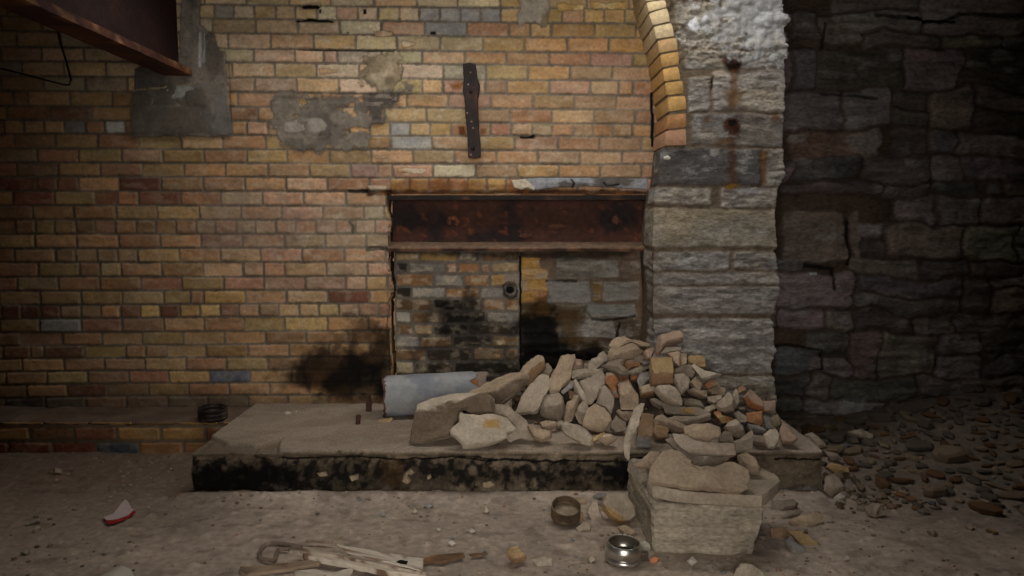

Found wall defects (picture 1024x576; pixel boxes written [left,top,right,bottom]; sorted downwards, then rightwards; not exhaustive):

corrosion [722,57,742,73]
corrosion [719,117,740,189]
damp [516,300,603,369]